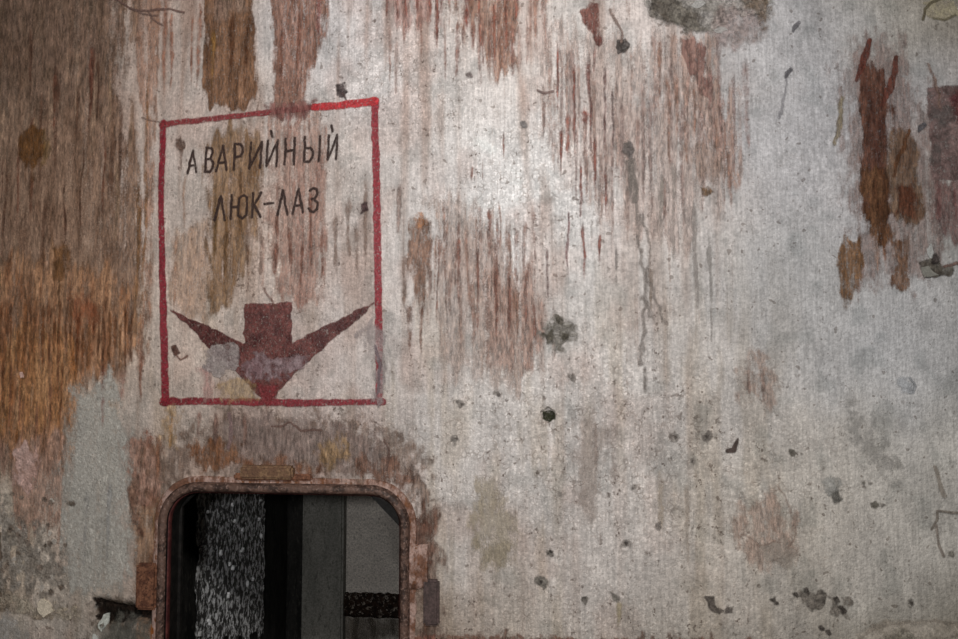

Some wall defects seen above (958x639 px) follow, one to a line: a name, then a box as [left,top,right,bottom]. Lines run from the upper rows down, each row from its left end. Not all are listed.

corrosion [0,0,174,537]
corrosion [190,0,367,313]
corrosion [397,187,555,397]
corrosion [386,0,742,265]
corrosion [833,33,958,300]
peeling [0,366,152,639]
corrosion [123,378,446,579]
corrosion [415,589,524,639]